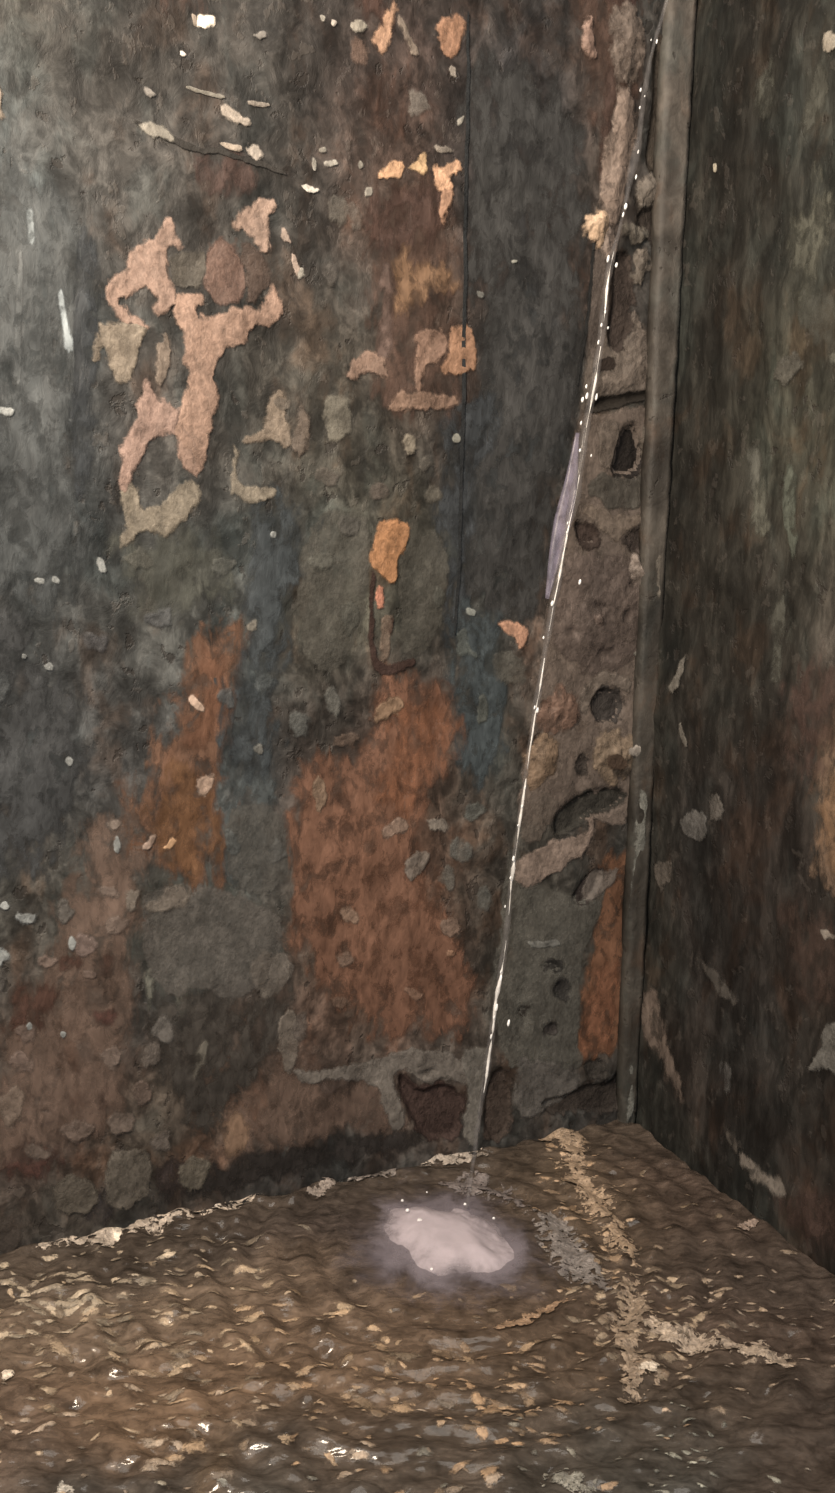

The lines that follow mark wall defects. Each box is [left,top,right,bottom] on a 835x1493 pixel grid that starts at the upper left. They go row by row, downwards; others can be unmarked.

peeling [320,2,418,64]
peeling [436,13,466,77]
peeling [302,145,461,229]
peeling [93,198,304,569]
peeling [347,324,477,412]
crack [454,12,470,634]
crack [576,240,645,413]
peeling [477,244,646,1143]
leakage [631,790,648,886]
leakage [0,901,35,924]
leakage [697,957,736,1006]
leakage [0,968,794,1404]